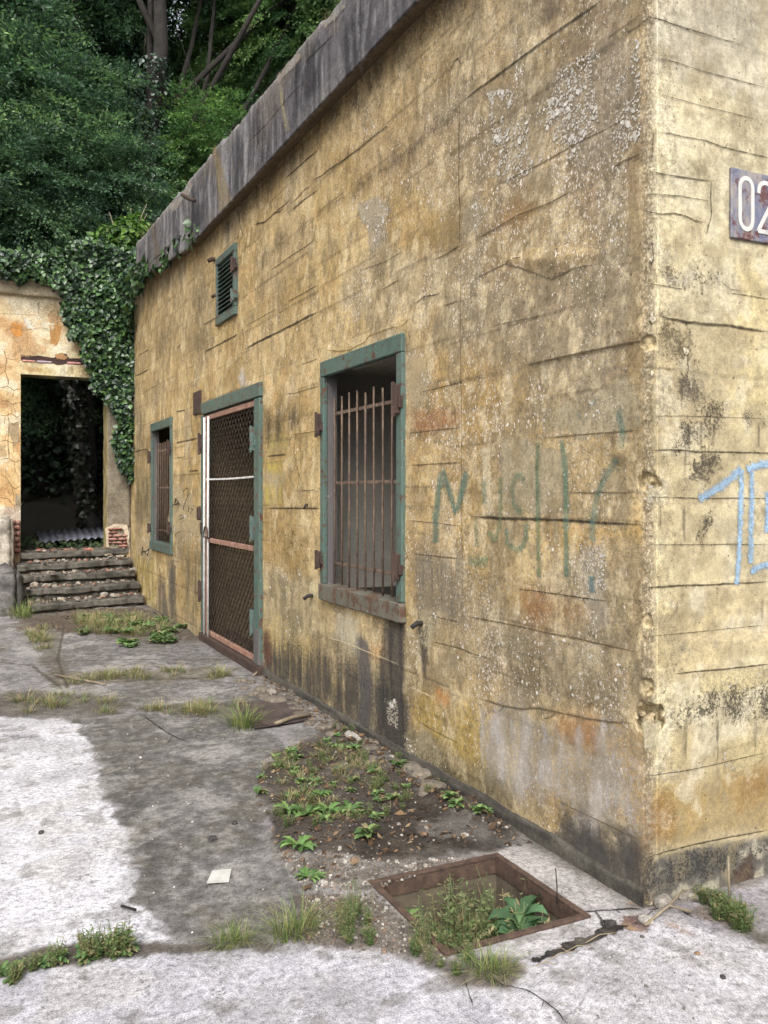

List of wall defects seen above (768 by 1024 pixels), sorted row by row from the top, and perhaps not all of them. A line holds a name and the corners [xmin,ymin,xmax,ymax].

crack [478,257,596,280]
leakage [657,308,726,490]
leakage [264,617,461,780]
spalling [433,562,668,749]
leakage [481,700,767,907]